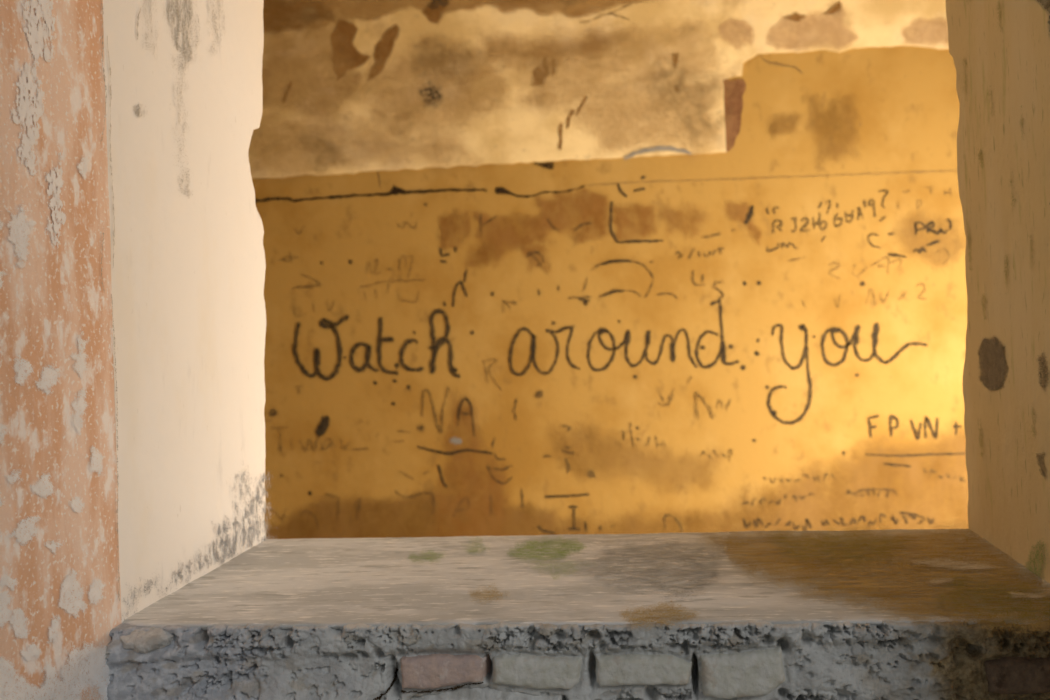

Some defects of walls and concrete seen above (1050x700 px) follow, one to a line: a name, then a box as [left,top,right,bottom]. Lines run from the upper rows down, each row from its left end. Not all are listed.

peeling [0,0,69,289]
damp [249,0,738,187]
peeling [13,331,91,435]
flaking render [1036,354,1049,392]
peeling [0,468,55,507]
peeling [8,514,62,555]
damp [121,388,1050,639]
crack [375,663,484,700]
spalling [0,568,1050,700]